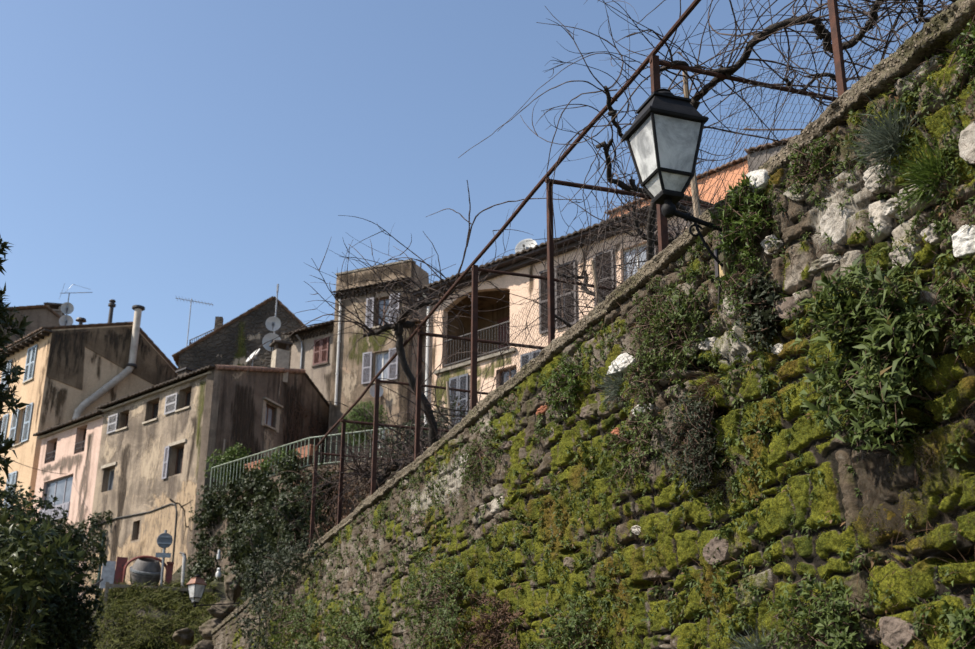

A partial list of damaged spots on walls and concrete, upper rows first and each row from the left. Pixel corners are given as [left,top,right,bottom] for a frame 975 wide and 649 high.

leakage [36,340,66,425]
leakage [222,384,260,467]